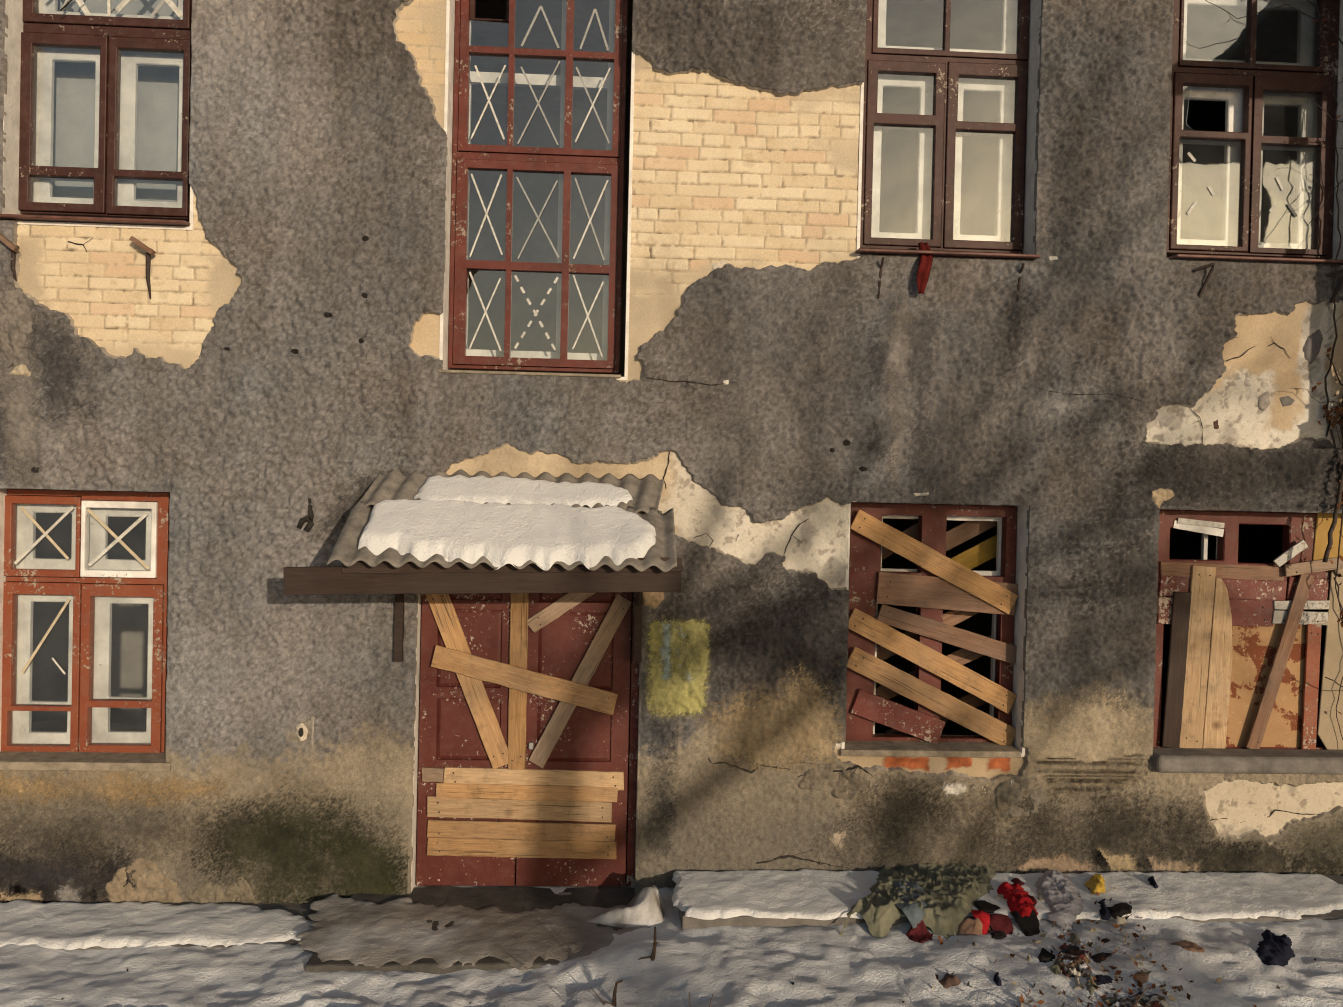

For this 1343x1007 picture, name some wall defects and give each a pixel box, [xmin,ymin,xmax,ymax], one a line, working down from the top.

flaking render [393,0,447,130]
flaking render [13,188,241,369]
peeling [408,311,440,360]
flaking render [615,51,862,383]
spalling [1145,299,1343,451]
spalling [445,443,850,591]
damp [0,808,220,904]
damp [827,784,1343,876]
spalling [1203,778,1343,846]